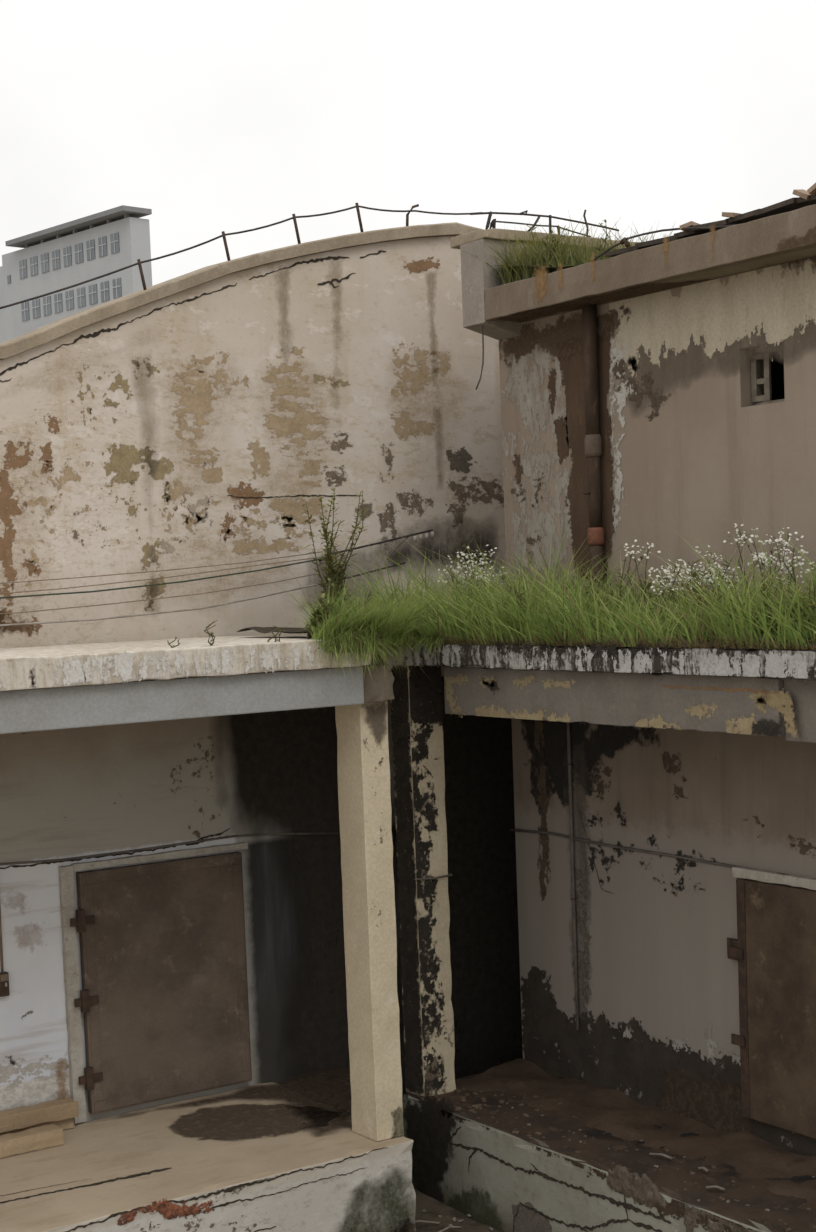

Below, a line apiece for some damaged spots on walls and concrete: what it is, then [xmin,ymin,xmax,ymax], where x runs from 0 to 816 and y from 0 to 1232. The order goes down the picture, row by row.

crack [0,250,386,382]
peeling [611,301,631,329]
peeling [610,357,670,421]
peeling [0,346,353,637]
peeling [479,675,498,692]
peeling [635,698,722,730]
damp [168,706,352,1136]
damp [340,645,816,1232]
peeling [0,1055,69,1087]
crack [0,1168,170,1203]
crack [66,1147,387,1232]
crack [448,1126,671,1232]